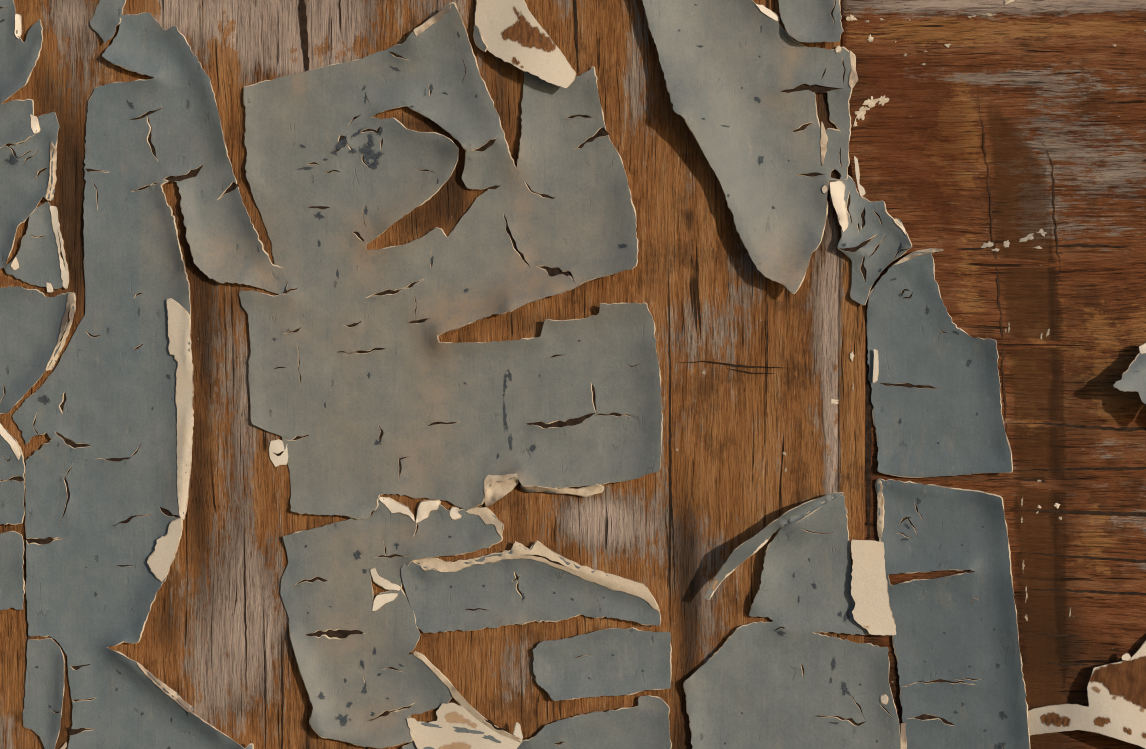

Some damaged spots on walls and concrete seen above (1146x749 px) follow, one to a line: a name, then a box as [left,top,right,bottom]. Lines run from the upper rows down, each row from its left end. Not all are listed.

peeling [0,0,672,749]
peeling [642,0,1146,749]